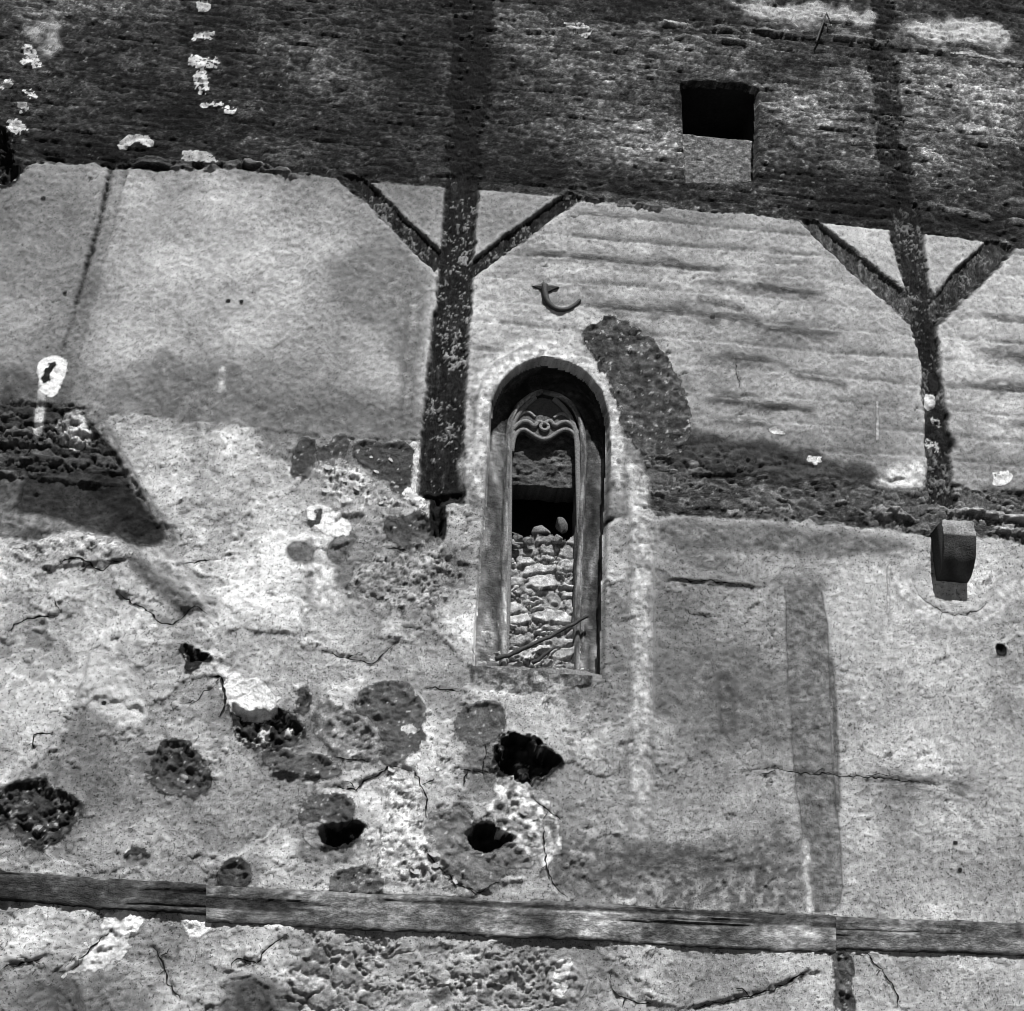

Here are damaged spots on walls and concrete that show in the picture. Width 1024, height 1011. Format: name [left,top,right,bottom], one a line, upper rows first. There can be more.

spalling [581,315,692,463]
peeling [290,434,469,613]
crack [57,557,126,571]
crack [118,592,207,625]
spalling [178,642,213,673]
spalling [0,777,85,852]
spalling [145,737,212,798]
peeling [216,673,565,898]
crack [744,767,933,784]
crack [534,799,566,896]
crack [694,972,811,1009]
crack [861,950,899,1007]